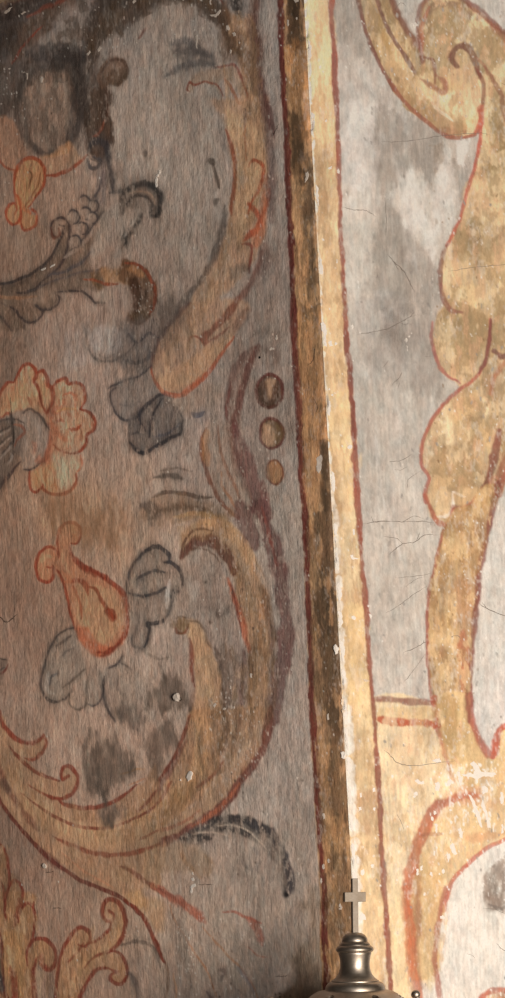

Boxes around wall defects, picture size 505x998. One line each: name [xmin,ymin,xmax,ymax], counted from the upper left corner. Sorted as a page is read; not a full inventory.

peeling [413,761,504,834]
peeling [416,827,463,877]